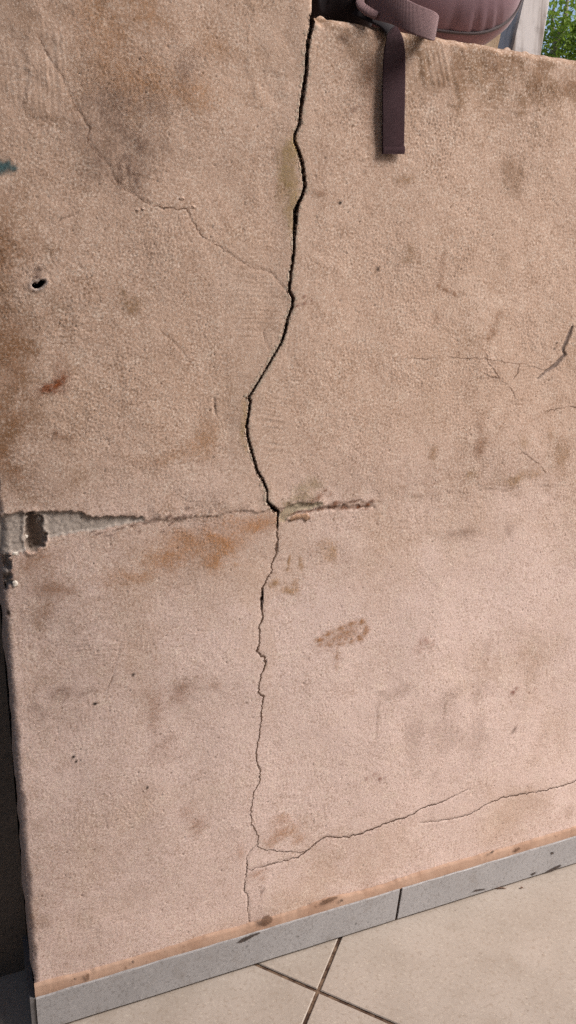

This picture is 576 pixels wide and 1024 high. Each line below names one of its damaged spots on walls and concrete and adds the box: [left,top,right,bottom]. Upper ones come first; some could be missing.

spalling [0,511,144,589]
crack [74,14,576,921]